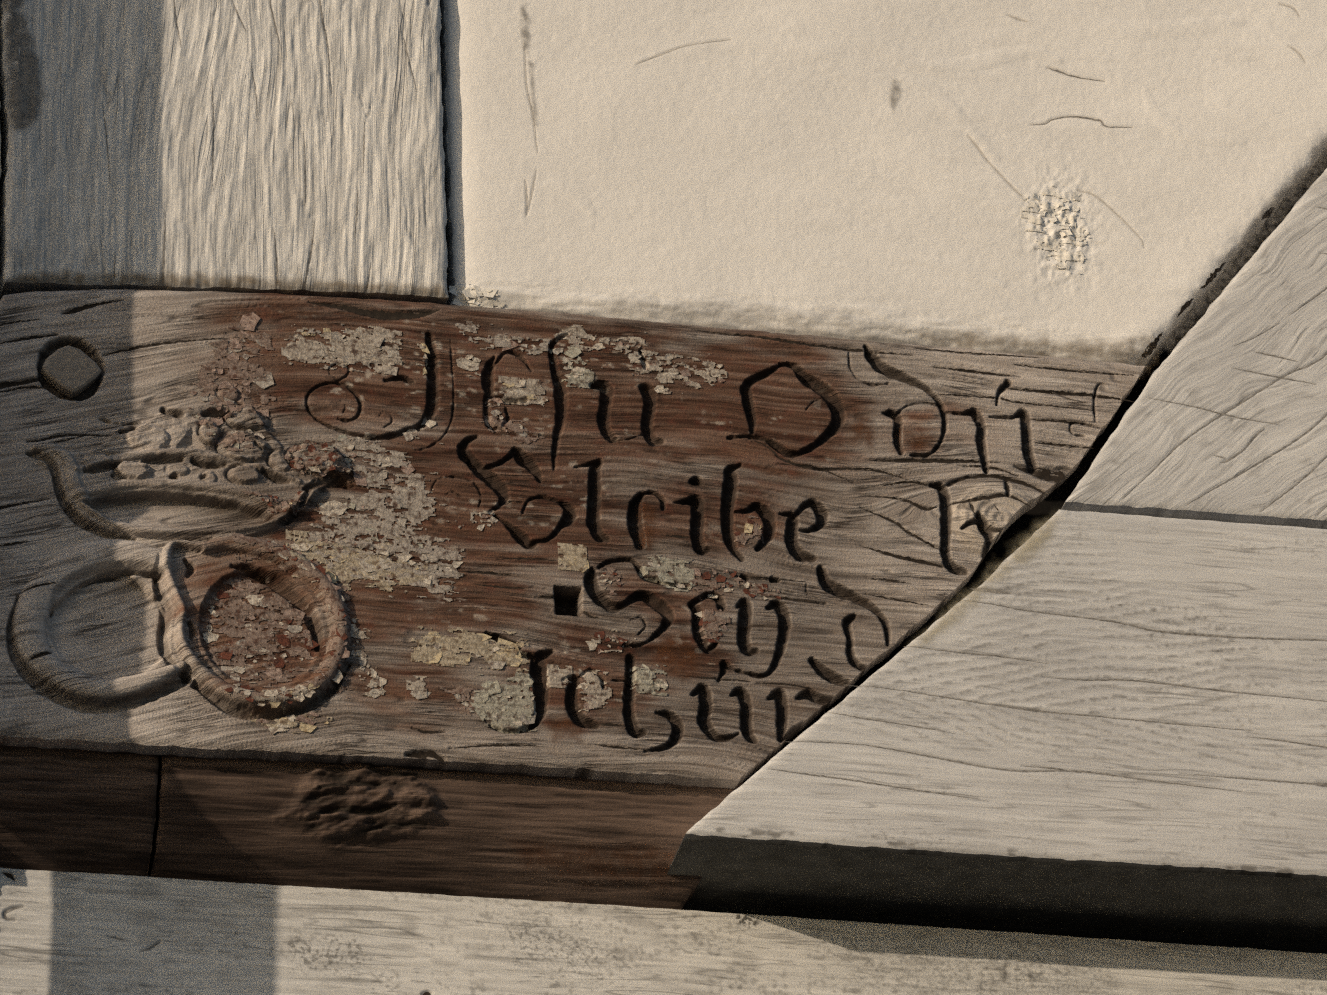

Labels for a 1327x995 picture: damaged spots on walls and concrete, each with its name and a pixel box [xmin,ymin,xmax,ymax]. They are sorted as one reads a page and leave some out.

flaking render [1020,185,1091,274]
peeling [188,312,430,451]
peeling [479,376,548,444]
peeling [448,283,727,394]
peeling [199,417,498,734]
peeling [557,542,623,595]
peeling [638,555,781,644]
peeling [406,626,636,734]
peeling [630,664,668,696]